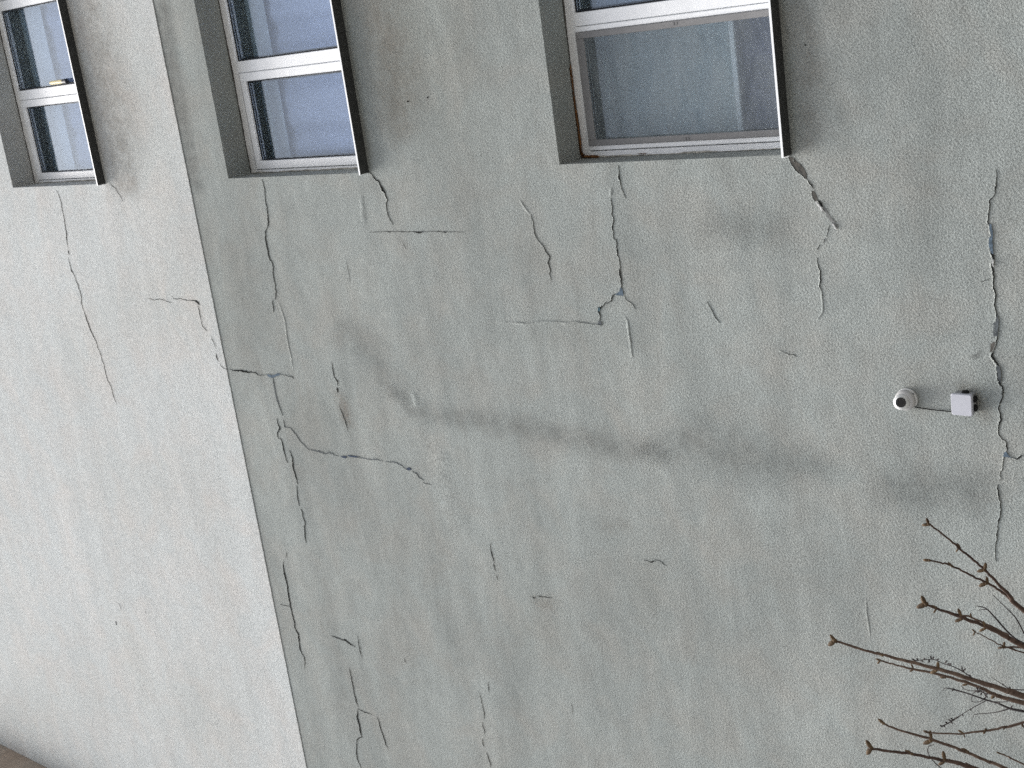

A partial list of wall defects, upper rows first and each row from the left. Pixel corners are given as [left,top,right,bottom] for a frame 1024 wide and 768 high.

crack [57,192,117,404]
crack [368,172,447,249]
crack [531,214,552,281]
crack [575,165,636,326]
crack [784,155,838,297]
crack [980,169,1024,561]
crack [148,298,431,667]